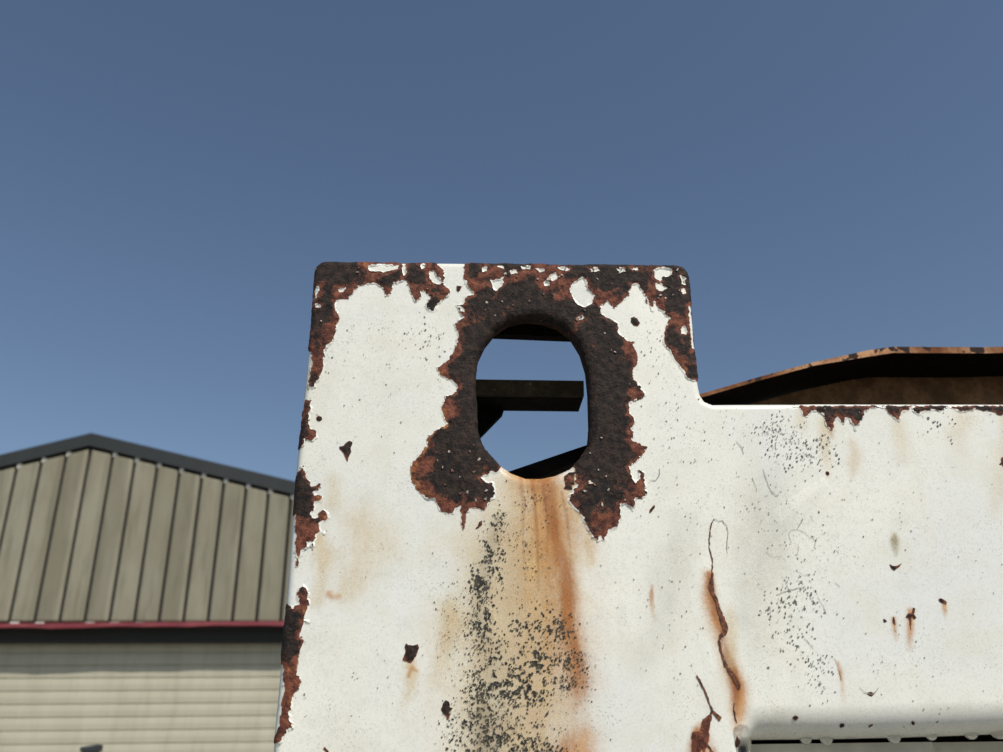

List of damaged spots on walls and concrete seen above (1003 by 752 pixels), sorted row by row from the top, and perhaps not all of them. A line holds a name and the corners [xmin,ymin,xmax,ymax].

corrosion [293,262,698,752]
corrosion [793,405,1003,432]
corrosion [274,579,311,744]
crack [696,519,740,752]